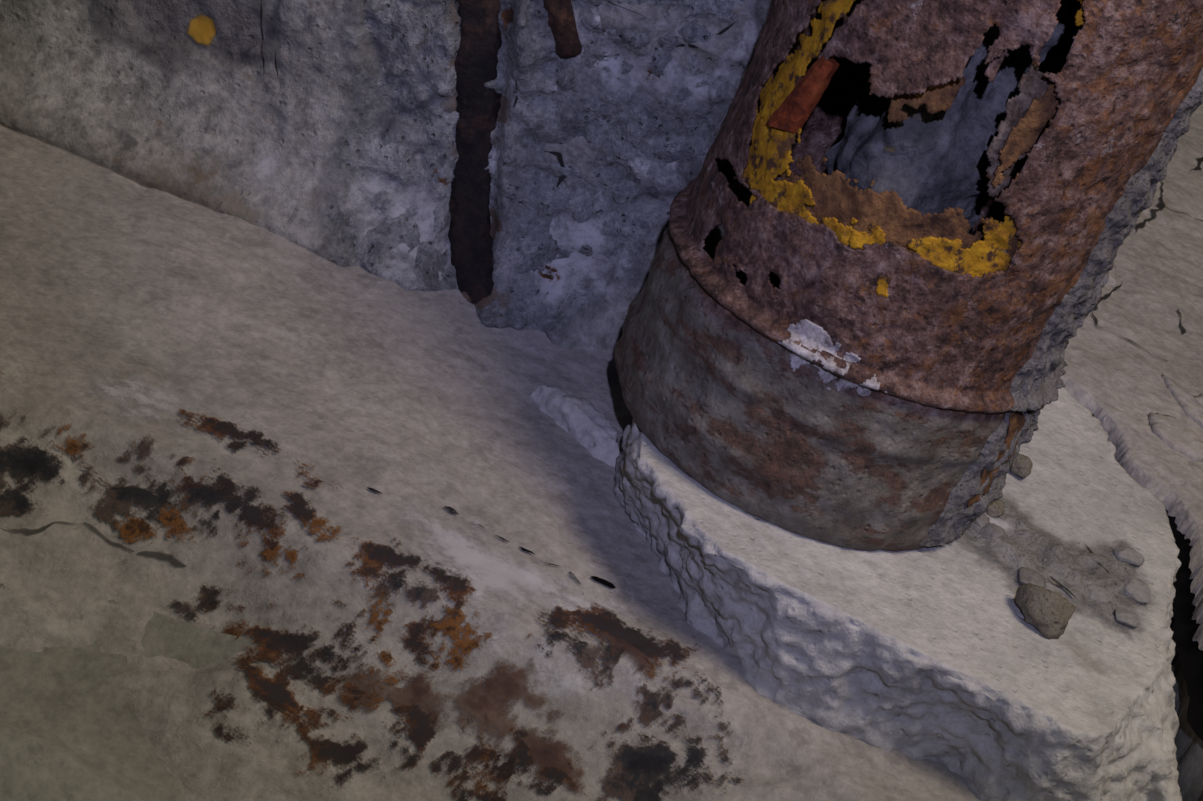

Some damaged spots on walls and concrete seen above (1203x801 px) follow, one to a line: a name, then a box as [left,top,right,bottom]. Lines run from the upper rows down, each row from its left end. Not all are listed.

spalling [321,0,764,342]
corrosion [538,265,560,281]
corrosion [0,409,341,578]
corrosion [166,538,743,801]
crack [1050,576,1076,598]
crack [1165,509,1203,742]